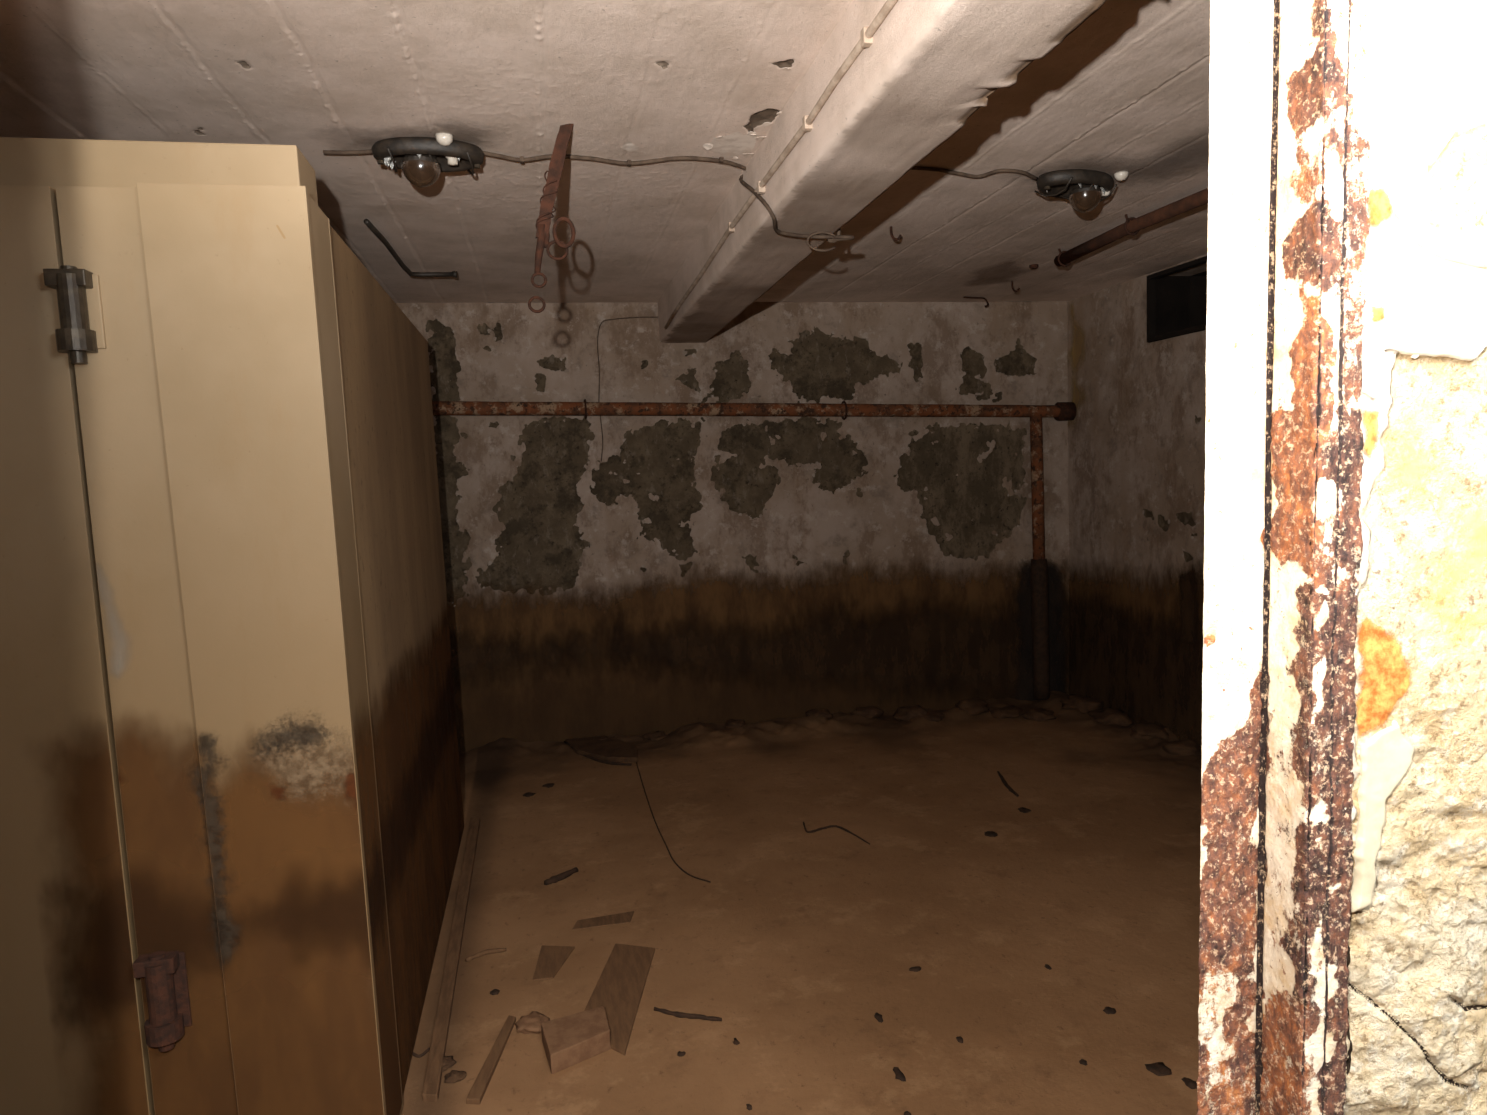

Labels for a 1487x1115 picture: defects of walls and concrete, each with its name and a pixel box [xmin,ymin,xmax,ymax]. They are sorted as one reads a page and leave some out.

corrosion [1368,188,1393,226]
spalling [425,319,923,607]
spalling [893,420,1027,561]
spalling [955,338,1037,403]
corrosion [1362,411,1379,455]
corrosion [1371,306,1387,322]
spalling [1343,122,1487,1115]
water stain [63,564,1204,1115]
crack [1346,916,1468,1089]
crack [1449,996,1487,1011]